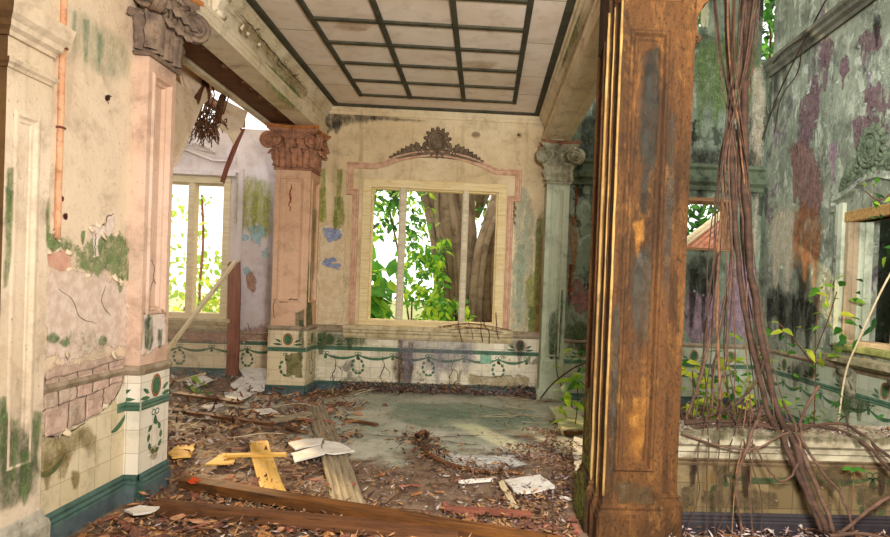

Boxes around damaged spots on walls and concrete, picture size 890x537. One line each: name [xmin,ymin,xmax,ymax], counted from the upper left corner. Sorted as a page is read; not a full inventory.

damp [326,114,375,132]
peeling [767,36,850,291]
peeling [851,26,890,149]
flaking render [42,247,130,440]
peeling [88,213,115,257]
peeling [243,266,257,296]
peeling [316,221,346,325]
damp [398,340,413,379]
damp [687,256,716,332]
damp [767,254,819,349]